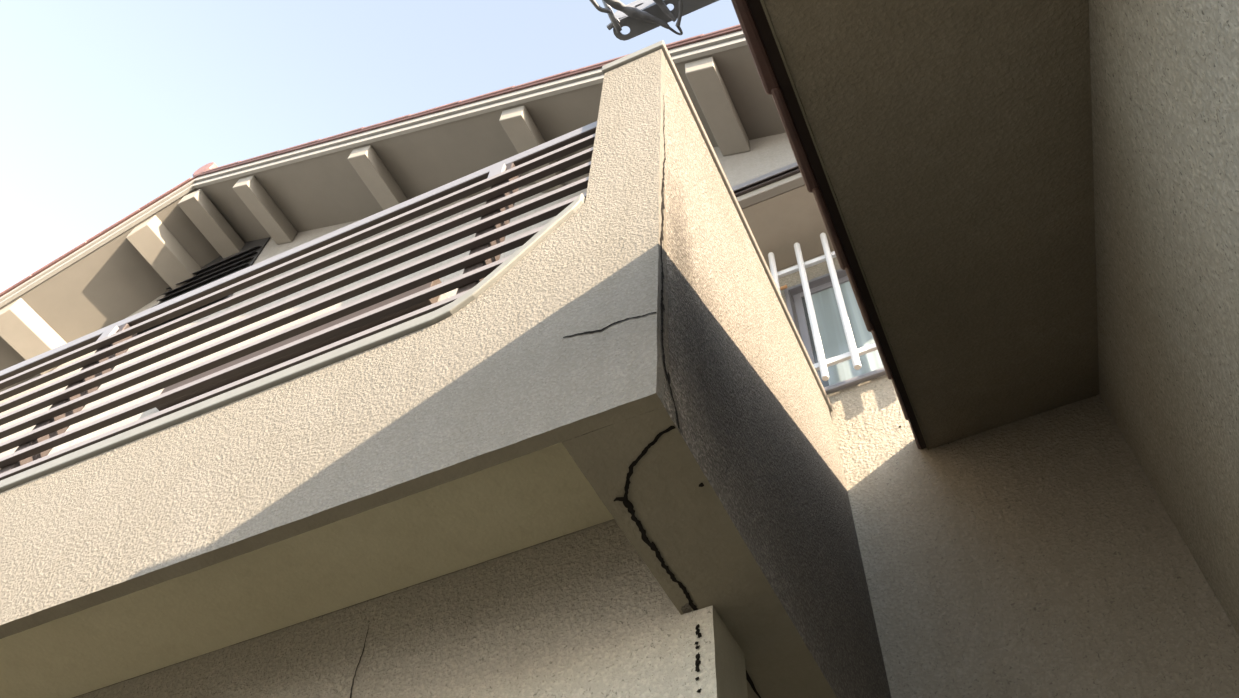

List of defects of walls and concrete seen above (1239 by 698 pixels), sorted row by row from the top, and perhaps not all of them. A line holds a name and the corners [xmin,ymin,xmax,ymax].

crack [563,93,698,613]
crack [350,626,369,698]